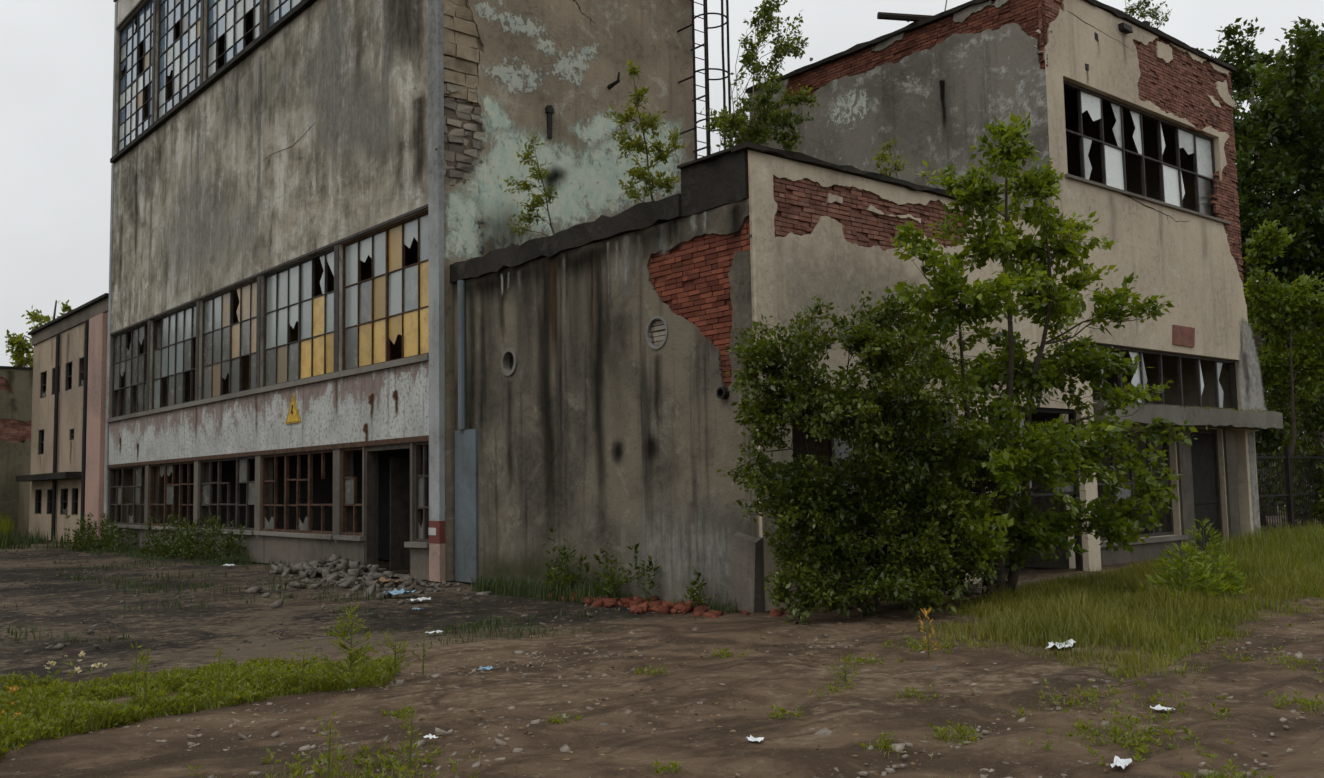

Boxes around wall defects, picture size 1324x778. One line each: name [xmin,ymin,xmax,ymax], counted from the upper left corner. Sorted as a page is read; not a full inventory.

peeling [435,0,684,258]
flaking render [773,177,966,251]
flaking render [787,0,1063,132]
flaking render [1133,38,1258,291]
leakage [465,211,707,477]
flaking render [649,217,752,387]
flaking render [0,418,32,443]
leakage [642,520,728,587]